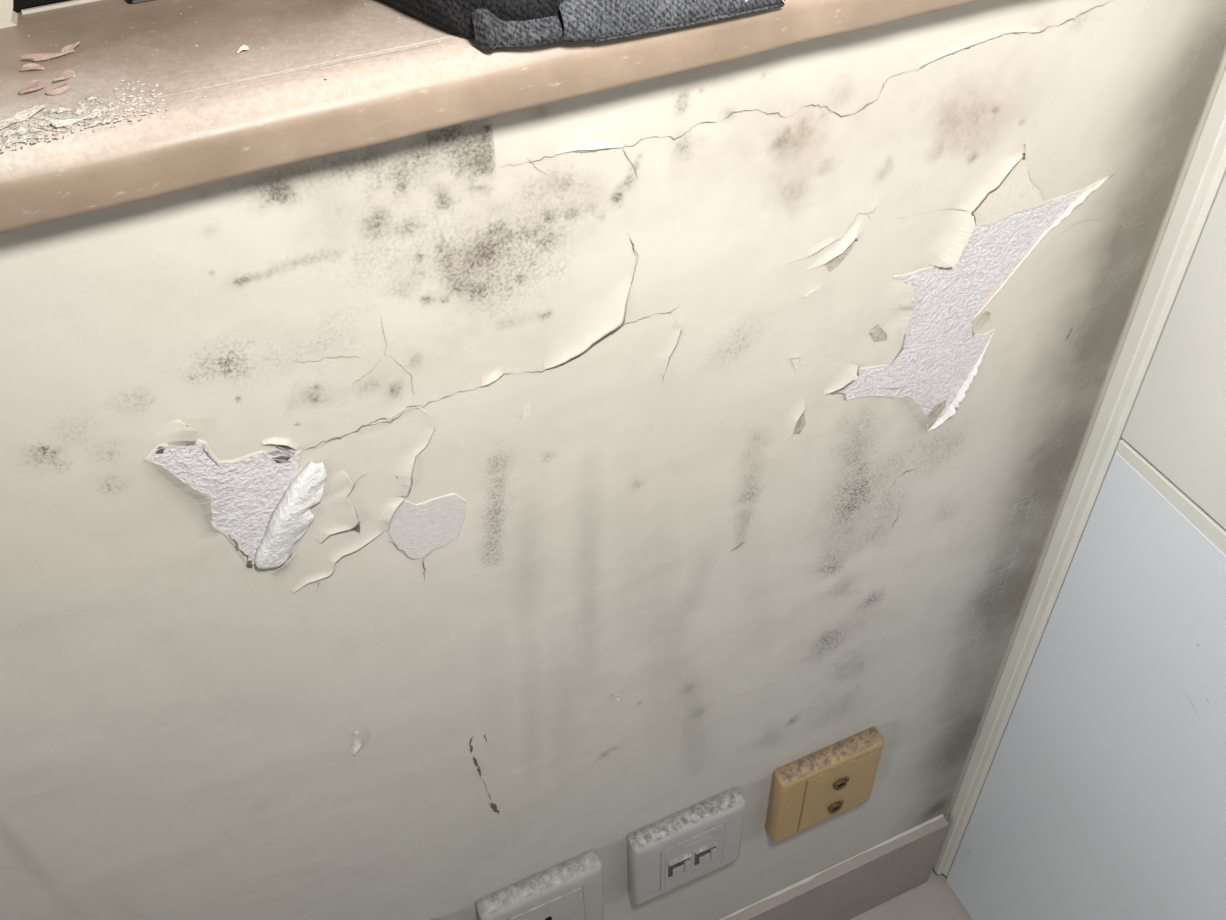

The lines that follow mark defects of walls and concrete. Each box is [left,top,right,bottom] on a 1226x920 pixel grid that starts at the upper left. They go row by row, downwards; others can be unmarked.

crack [501,1,1112,176]
damp [417,125,493,174]
damp [454,229,507,294]
peeling [801,214,873,273]
crack [787,195,959,265]
peeling [823,145,1115,441]
damp [1027,19,1226,507]
crack [295,235,682,452]
peeling [781,391,806,444]
peeling [139,406,466,594]
damp [980,547,1036,627]
damp [944,714,981,764]